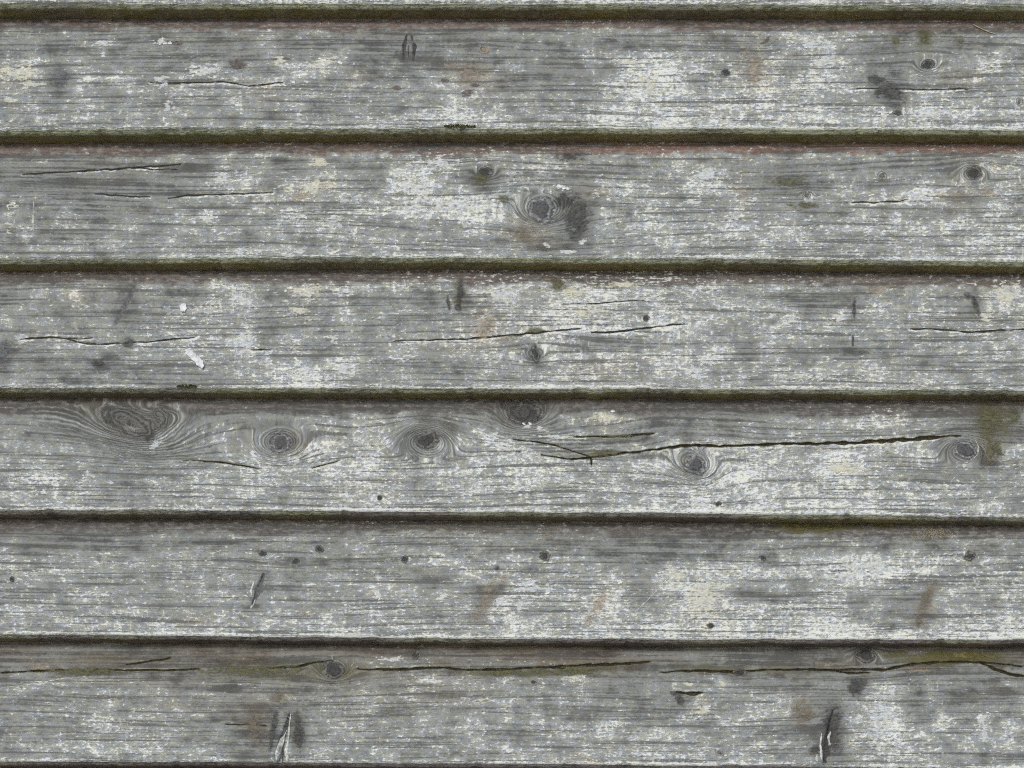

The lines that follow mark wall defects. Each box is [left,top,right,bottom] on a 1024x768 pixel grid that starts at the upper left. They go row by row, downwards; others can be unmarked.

crack [150,79,283,87]
crack [23,164,273,199]
crack [393,300,682,342]
crack [911,326,1024,334]
crack [19,336,195,345]
crack [513,433,961,465]
crack [1,667,65,675]
crack [95,657,199,671]
crack [269,660,333,669]
crack [357,661,1024,696]